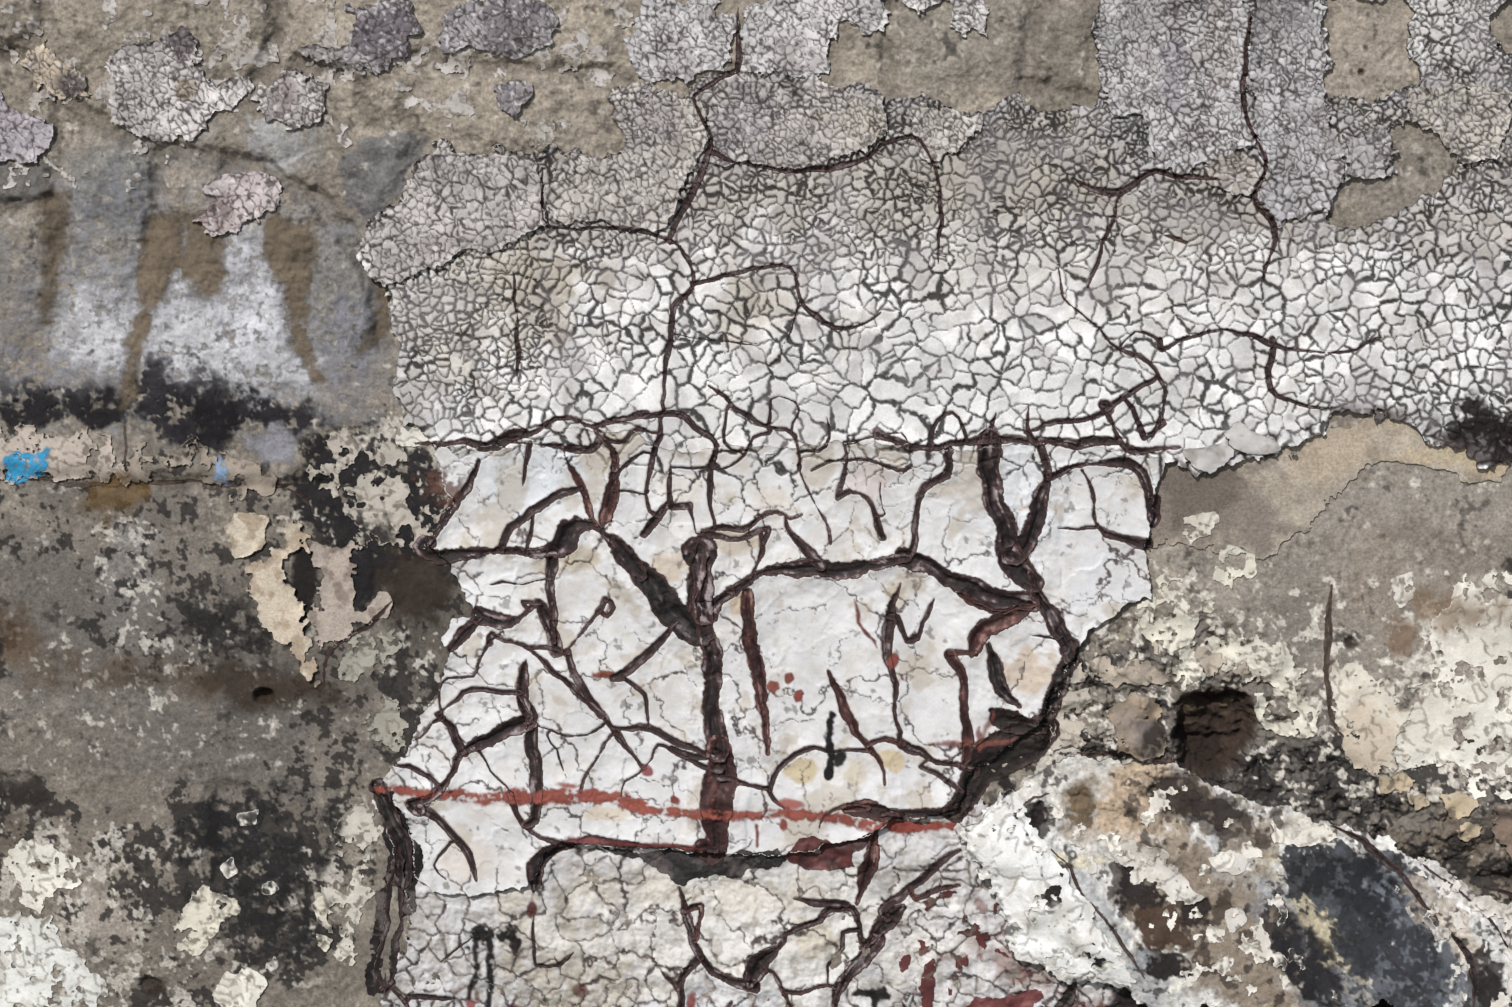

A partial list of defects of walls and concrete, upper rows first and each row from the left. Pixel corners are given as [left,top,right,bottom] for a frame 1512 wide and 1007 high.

peeling [0,0,989,199]
peeling [191,171,283,237]
crack [356,0,1512,1007]
crack [323,600,393,687]
flaking render [0,410,1512,1007]